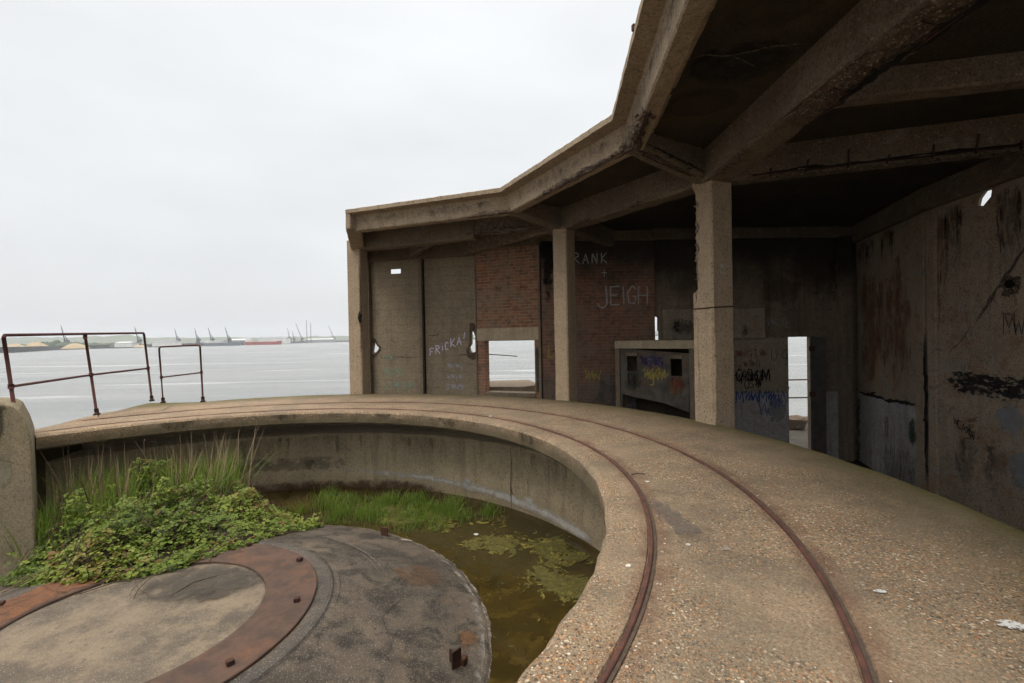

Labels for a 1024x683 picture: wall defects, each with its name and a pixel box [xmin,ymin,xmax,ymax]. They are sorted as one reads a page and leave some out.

spalling [535,107,656,200]
spalling [744,134,1024,181]
crack [950,248,1024,352]
crack [858,334,932,476]